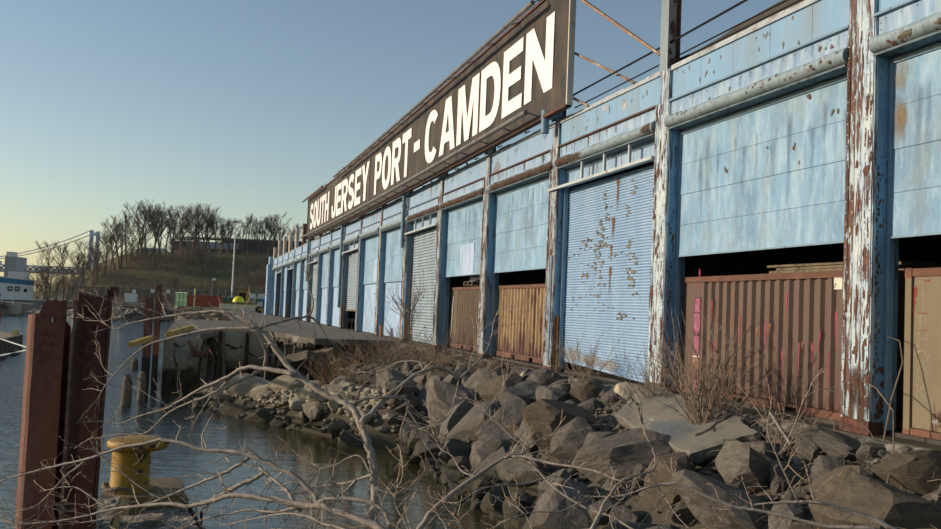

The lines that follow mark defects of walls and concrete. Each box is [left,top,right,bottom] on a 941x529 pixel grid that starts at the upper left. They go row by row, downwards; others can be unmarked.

peeling [745,44,838,94]
peeling [542,145,557,295]
peeling [567,190,637,320]
peeling [648,105,687,378]
peeling [841,31,888,400]